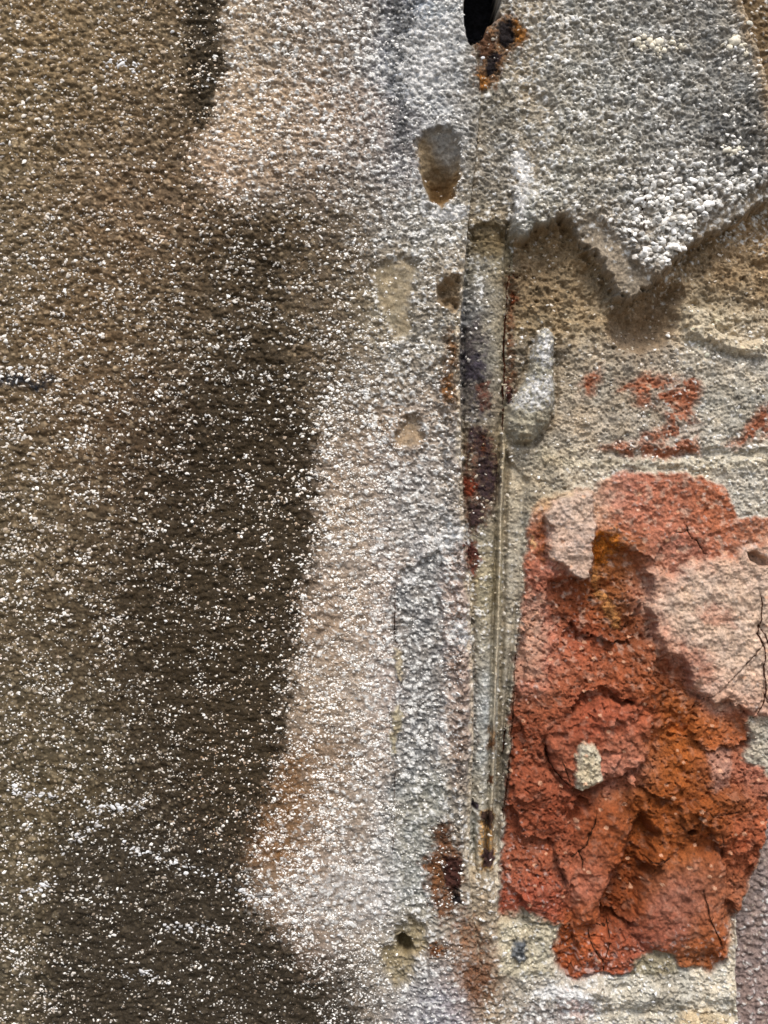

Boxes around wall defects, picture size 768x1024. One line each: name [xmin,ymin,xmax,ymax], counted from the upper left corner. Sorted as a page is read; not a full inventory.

rust [475,14,529,91]
spalling [415,128,461,208]
spalling [506,178,768,383]
rust [441,320,501,576]
water stain [0,0,371,1024]
spalling [542,492,656,649]
crack [544,739,571,785]
crack [571,811,597,867]
spalling [380,917,428,989]
rust [421,821,494,1005]
crack [588,916,611,970]
crack [704,893,722,956]